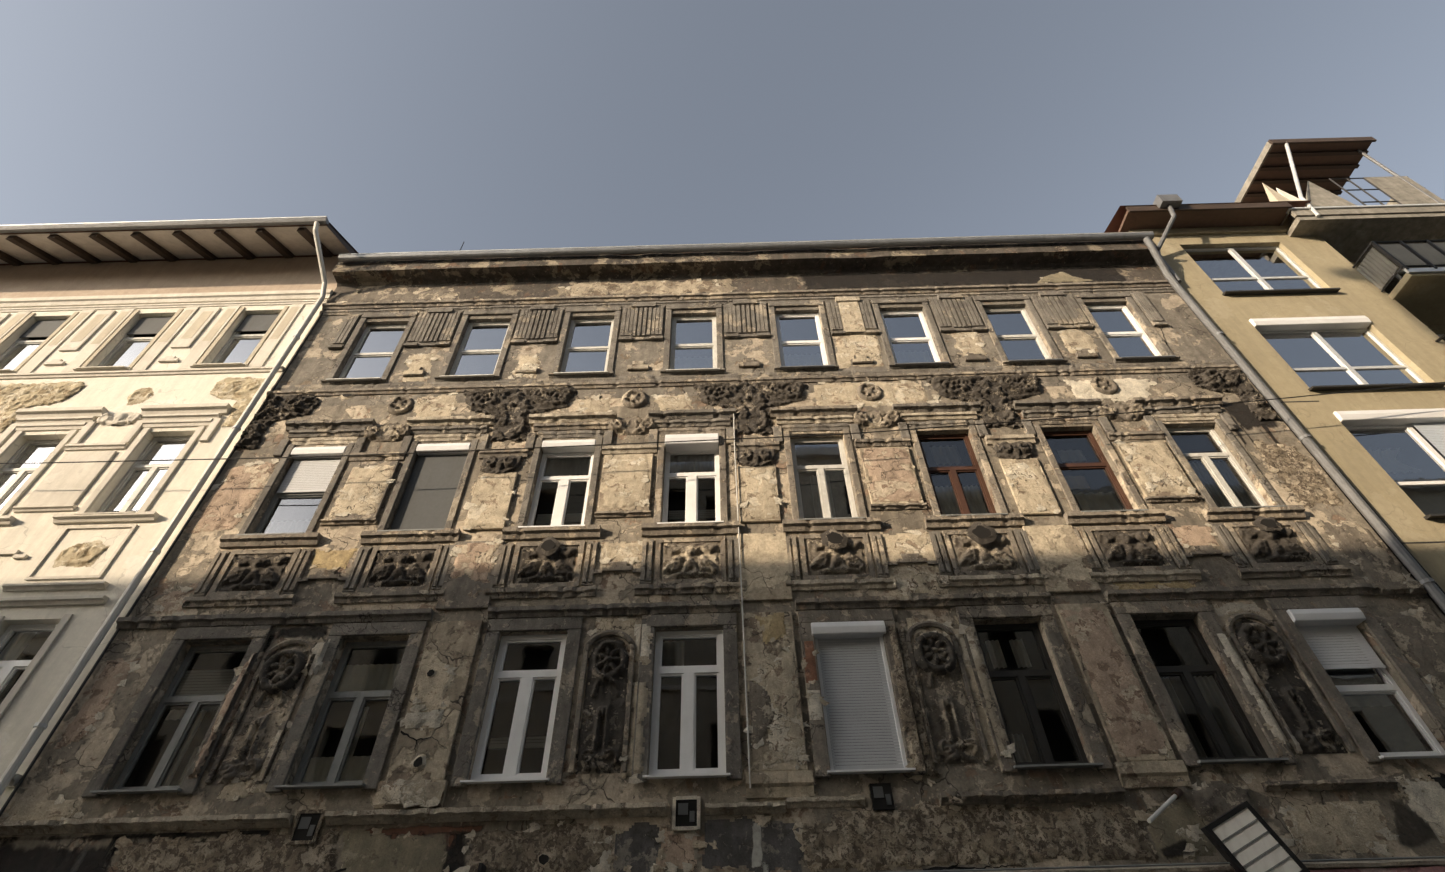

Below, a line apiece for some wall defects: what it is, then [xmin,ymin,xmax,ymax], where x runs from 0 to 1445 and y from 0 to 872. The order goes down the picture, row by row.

peeling [879,530,950,596]
flaking render [1253,439,1445,702]
peeling [0,794,84,821]
peeling [188,652,264,778]
peeling [217,721,292,801]
flaking render [115,820,615,872]
peeling [373,754,445,810]
peeling [397,662,458,730]
peeling [650,828,736,872]
peeling [743,624,830,770]
flaking render [790,616,1218,872]
peeling [1059,577,1170,759]